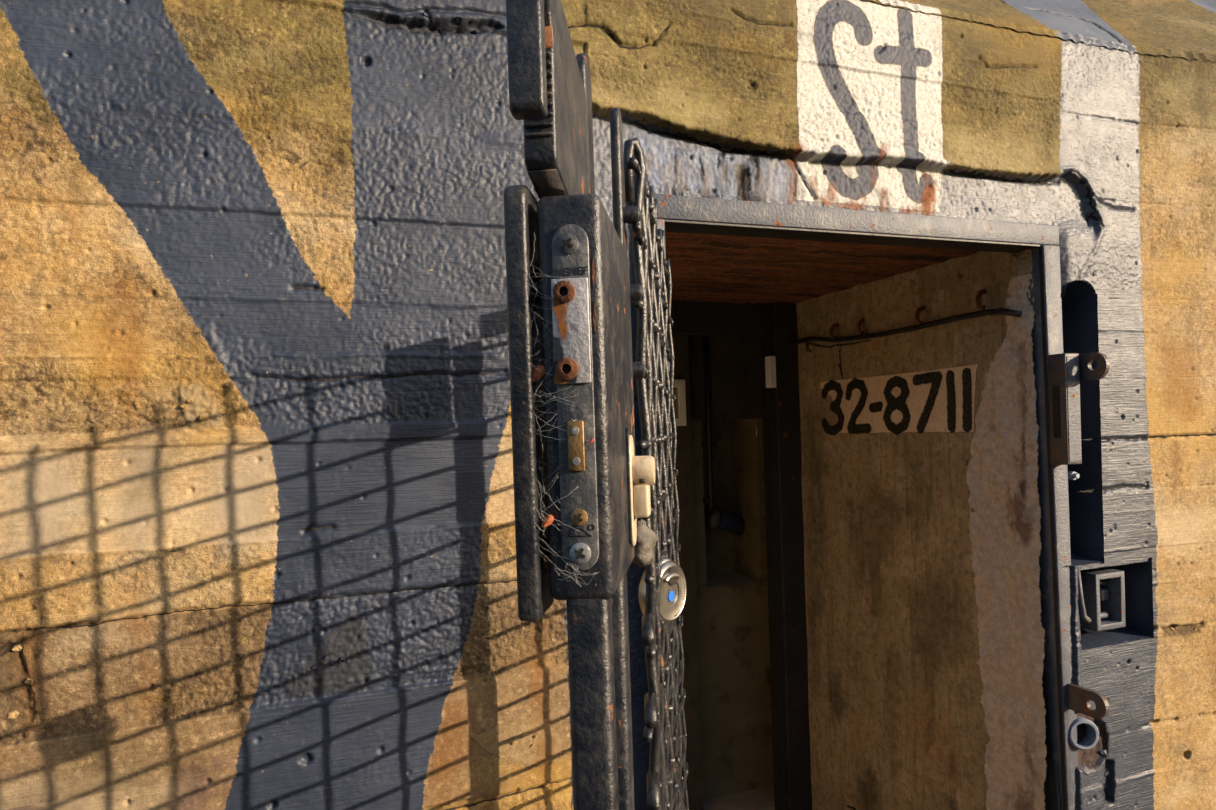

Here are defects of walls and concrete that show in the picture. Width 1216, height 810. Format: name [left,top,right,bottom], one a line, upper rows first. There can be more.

crack [568,24,670,49]
rust [880,185,936,215]